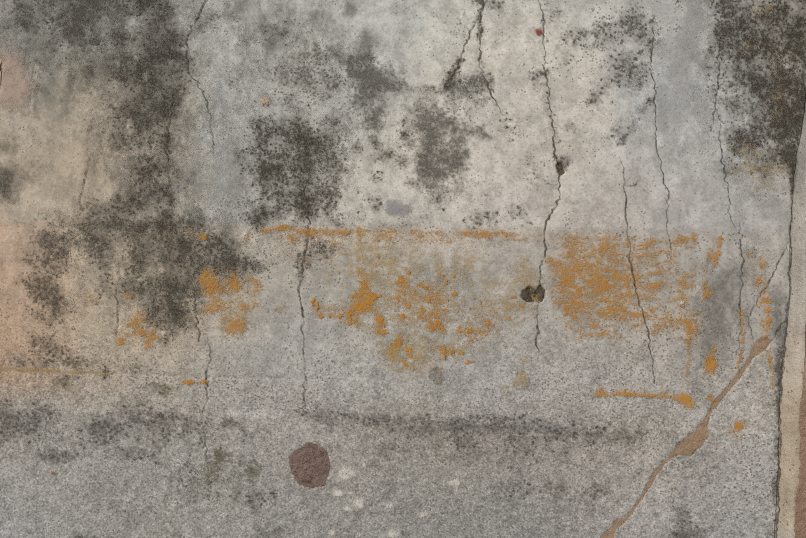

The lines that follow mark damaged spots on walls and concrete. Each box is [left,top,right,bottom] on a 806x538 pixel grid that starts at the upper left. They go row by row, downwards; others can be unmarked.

leakage [5,0,267,344]
leakage [229,19,540,374]
rust [259,224,539,247]
rust [310,253,495,370]
crack [448,0,501,113]
spalling [521,286,545,303]
crack [539,3,560,286]
leakage [562,7,659,106]
rust [544,231,722,408]
crack [601,7,797,538]
leakage [705,0,806,195]
spalling [290,442,363,488]